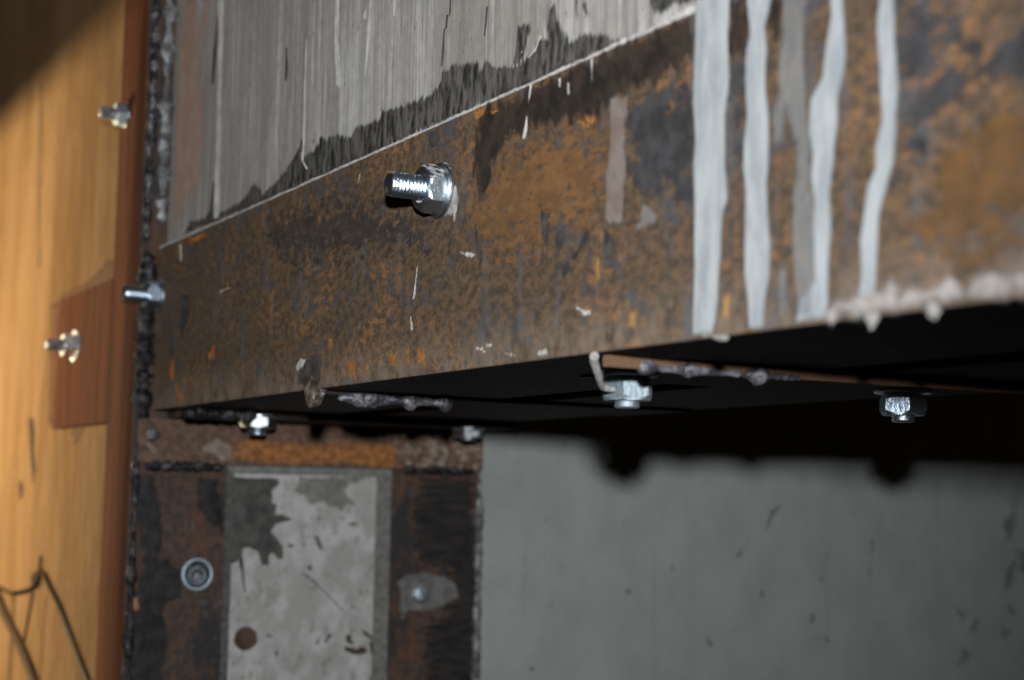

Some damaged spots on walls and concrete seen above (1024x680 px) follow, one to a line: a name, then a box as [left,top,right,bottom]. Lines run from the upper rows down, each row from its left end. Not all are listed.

peeling [186,4,618,232]
corrosion [464,113,619,274]
leakage [797,0,846,321]
leakage [855,0,1024,315]
peeling [231,477,294,592]
corrosion [234,627,257,651]
corrosion [345,631,373,655]